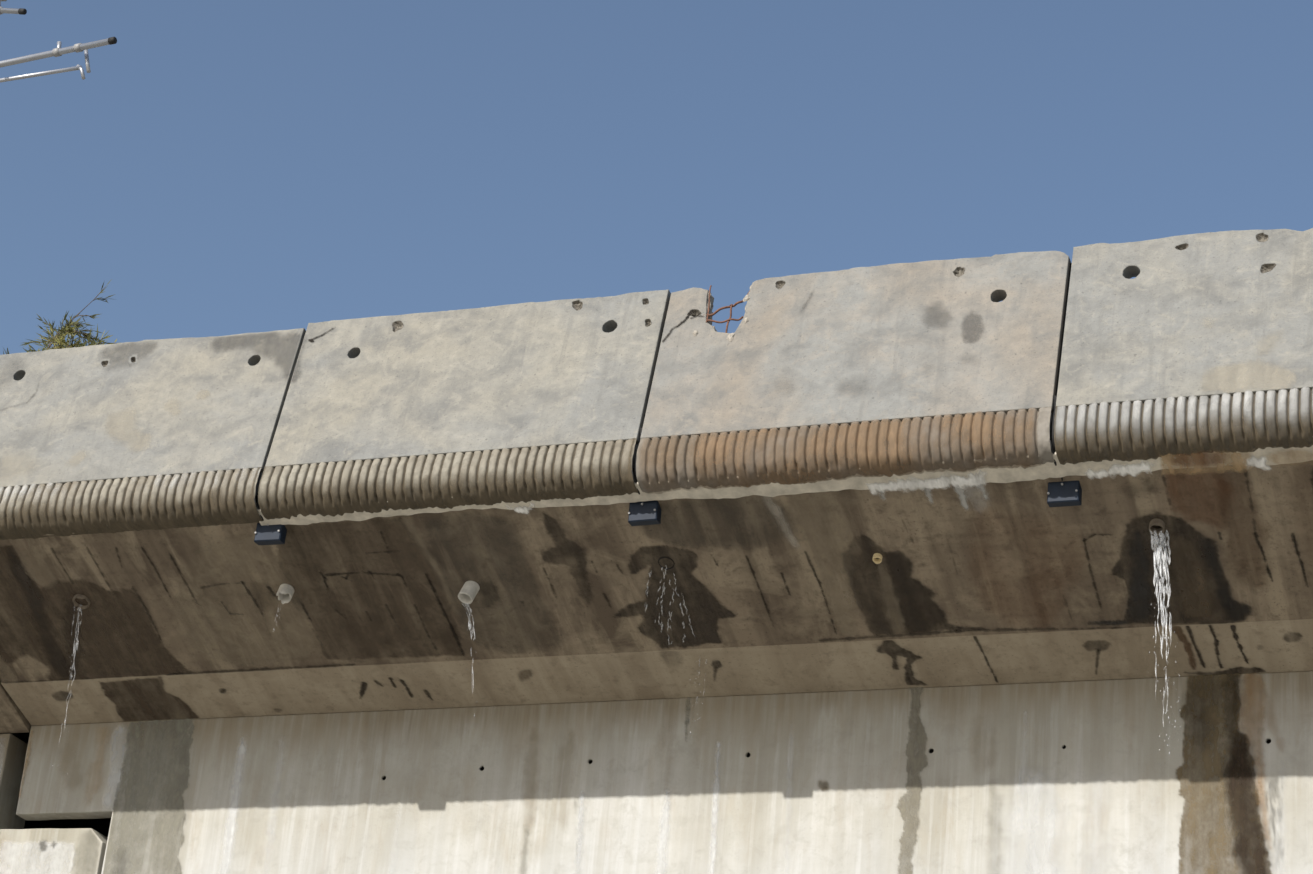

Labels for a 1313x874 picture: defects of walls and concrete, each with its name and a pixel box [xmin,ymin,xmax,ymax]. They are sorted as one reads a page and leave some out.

spalling [688,285,751,341]
leakage [0,546,372,874]
leakage [360,678,432,699]
leakage [616,508,735,648]
leakage [819,536,1055,874]
leakage [1073,513,1271,874]